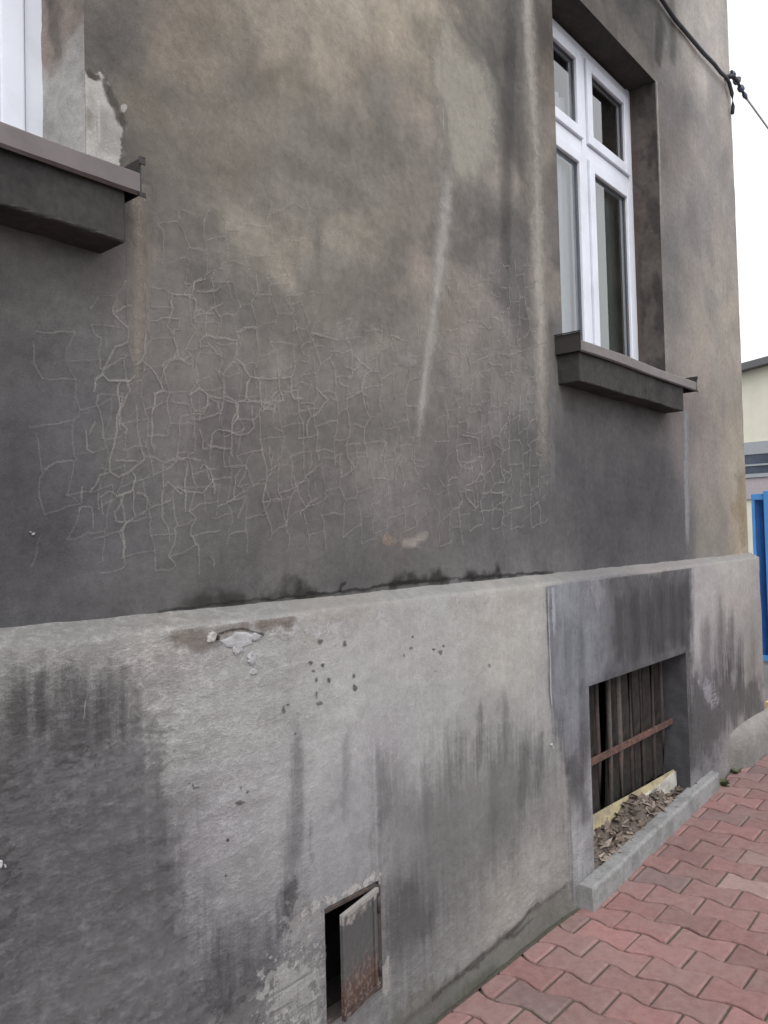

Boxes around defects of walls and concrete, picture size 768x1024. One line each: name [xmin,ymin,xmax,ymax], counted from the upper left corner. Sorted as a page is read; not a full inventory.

flaking render [85,69,127,166]
damp [192,594,243,607]
damp [283,581,316,599]
damp [391,571,449,590]
damp [467,566,501,582]
flaking render [206,631,262,675]
damp [689,662,763,769]
spalling [244,872,381,1024]
spalling [381,956,391,997]